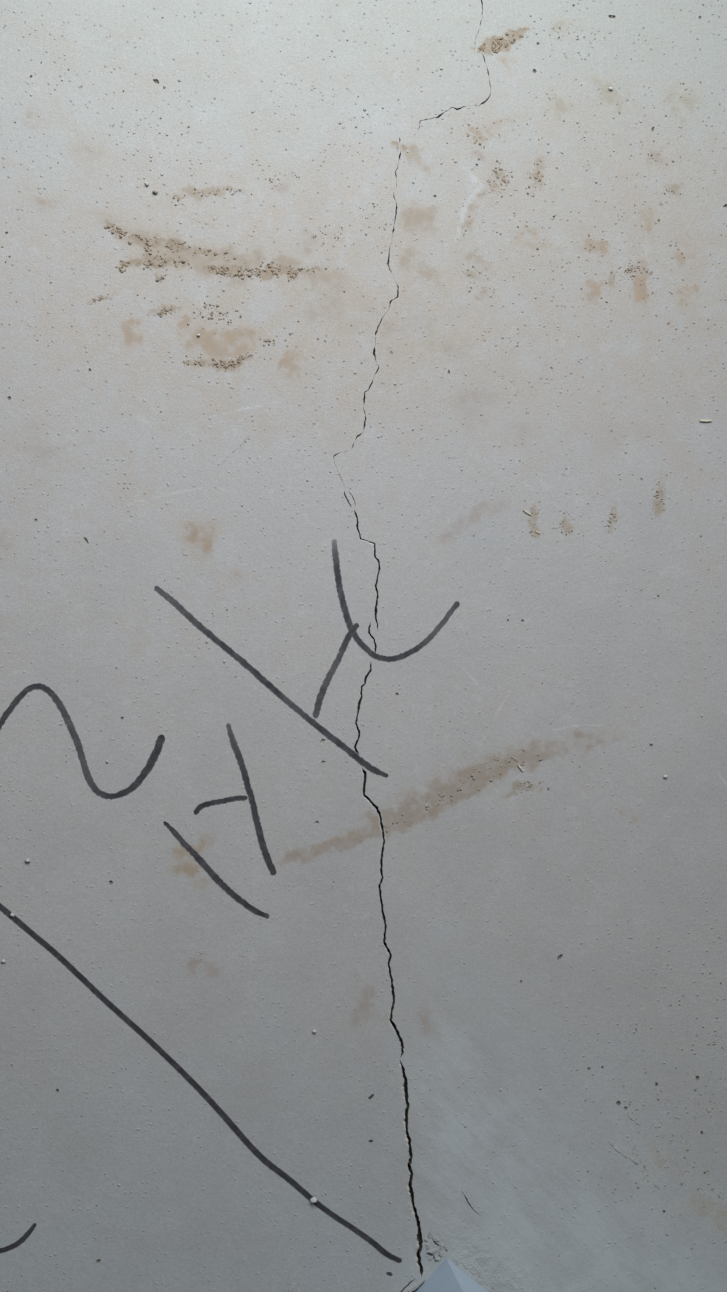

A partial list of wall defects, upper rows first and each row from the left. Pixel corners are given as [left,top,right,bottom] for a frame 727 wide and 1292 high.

water stain [106,219,345,321]
crack [333,0,491,1292]